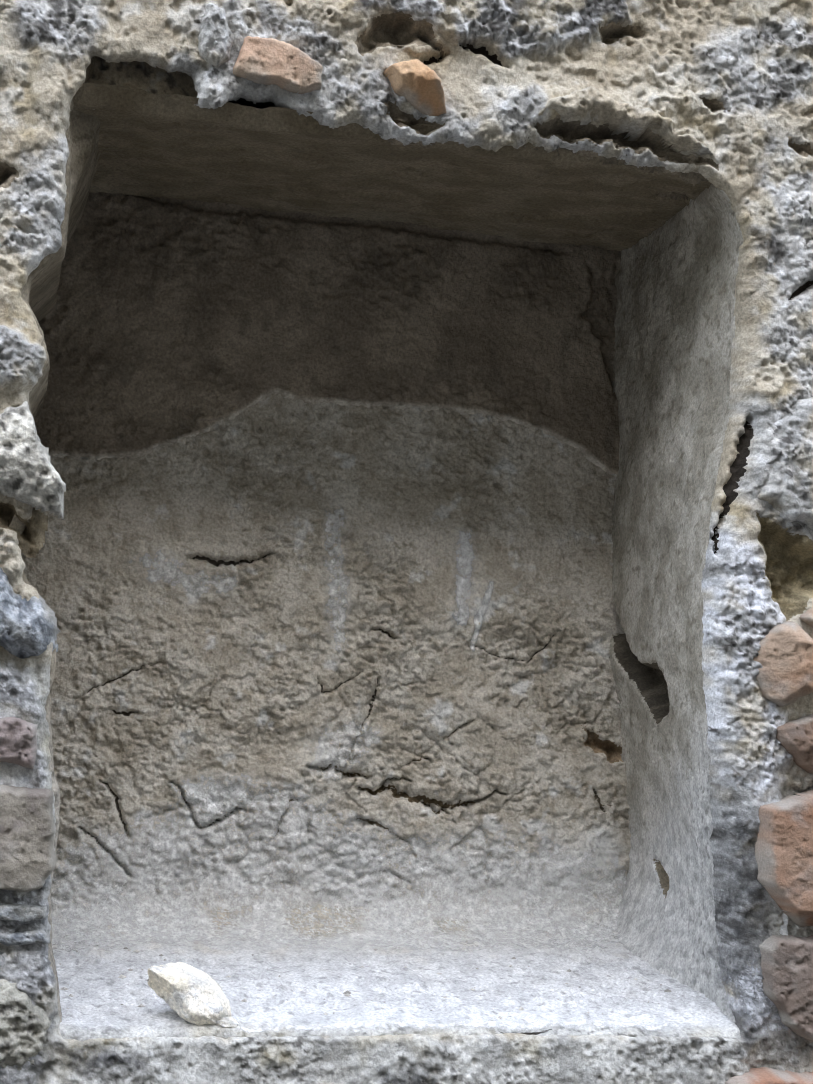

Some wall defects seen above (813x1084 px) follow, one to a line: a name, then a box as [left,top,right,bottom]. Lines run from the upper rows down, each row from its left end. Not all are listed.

crack [711,421,754,554]
crack [193,554,268,567]
crack [475,635,554,661]
crack [87,665,152,693]
crack [113,709,135,717]
crack [317,671,380,725]
crack [81,782,127,866]
crack [171,782,242,829]
crack [309,756,501,845]